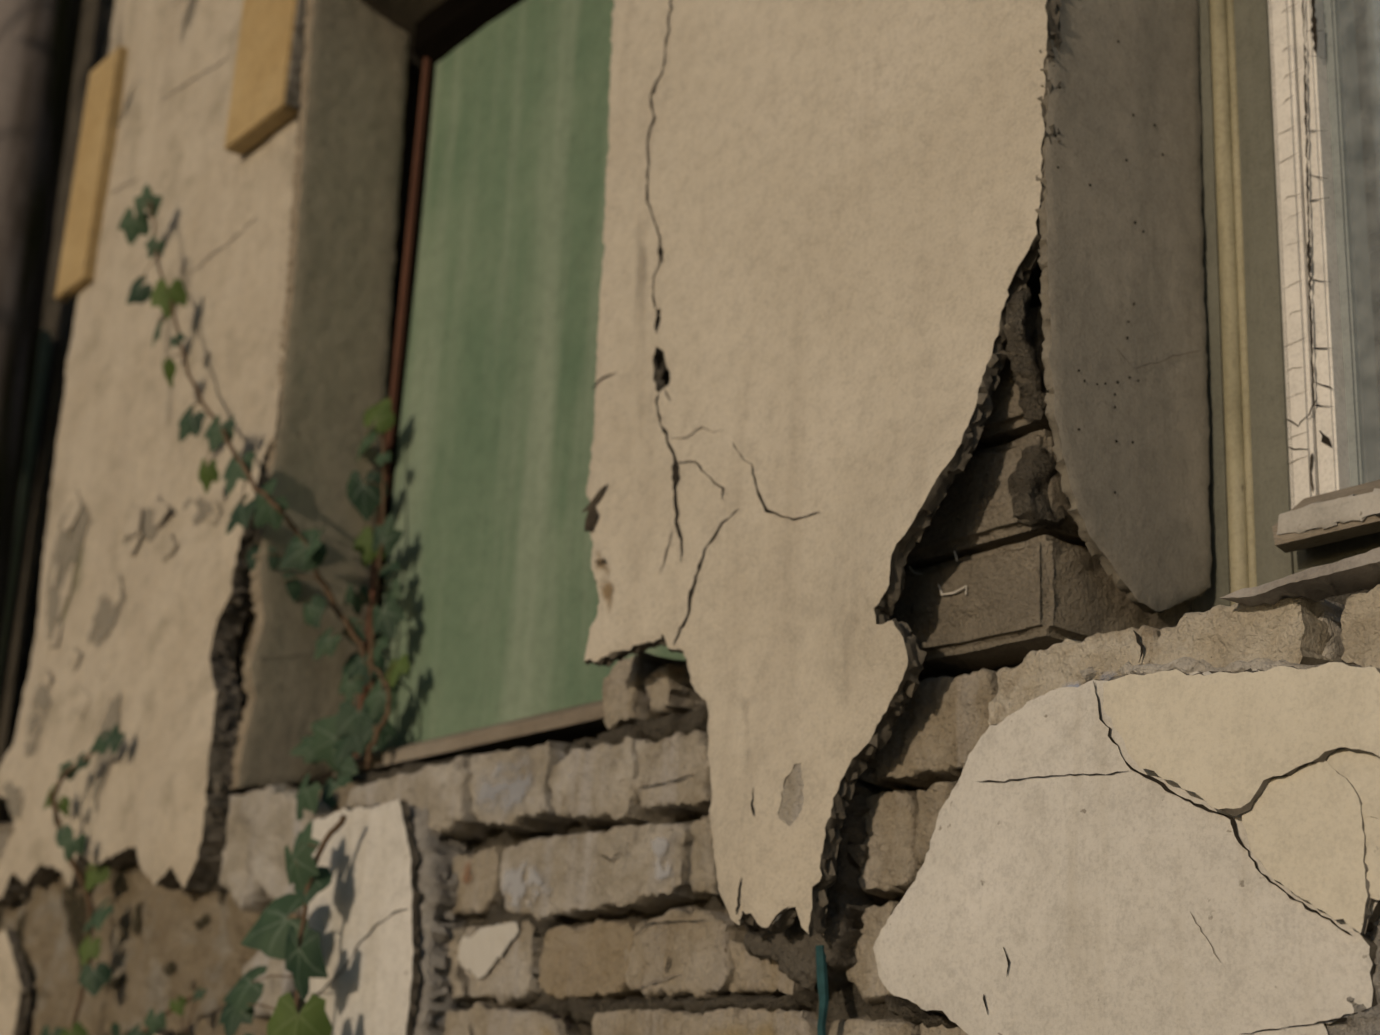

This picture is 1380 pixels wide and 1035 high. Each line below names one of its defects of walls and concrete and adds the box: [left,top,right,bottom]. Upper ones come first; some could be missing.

crack [646,0,672,308]
flaking render [0,0,819,1035]
crack [655,389,820,646]
flaking render [581,0,1380,1035]
crack [978,771,1125,783]
crack [983,947,1010,1015]
crack [1242,1007,1372,1034]